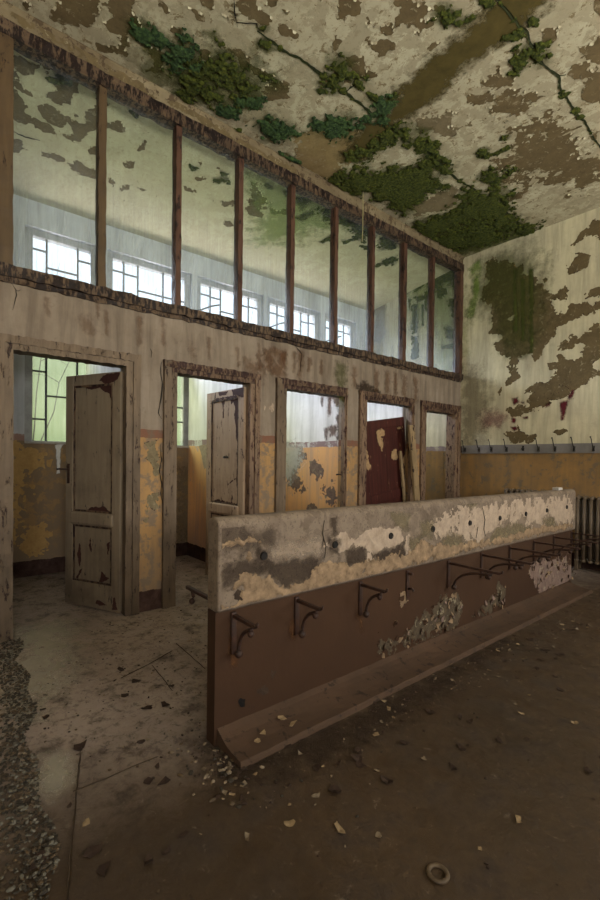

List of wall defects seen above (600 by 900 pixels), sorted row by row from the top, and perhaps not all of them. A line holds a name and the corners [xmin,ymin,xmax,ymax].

peeling [1,0,359,180]
crack [234,2,519,224]
peeling [332,0,445,88]
damp [339,0,552,163]
peeling [415,36,600,202]
crack [497,0,600,148]
peeling [245,181,281,218]
peeling [481,219,600,444]
peeling [13,440,53,558]
peeling [286,445,338,510]
peeling [221,487,576,610]
peeling [377,580,506,658]